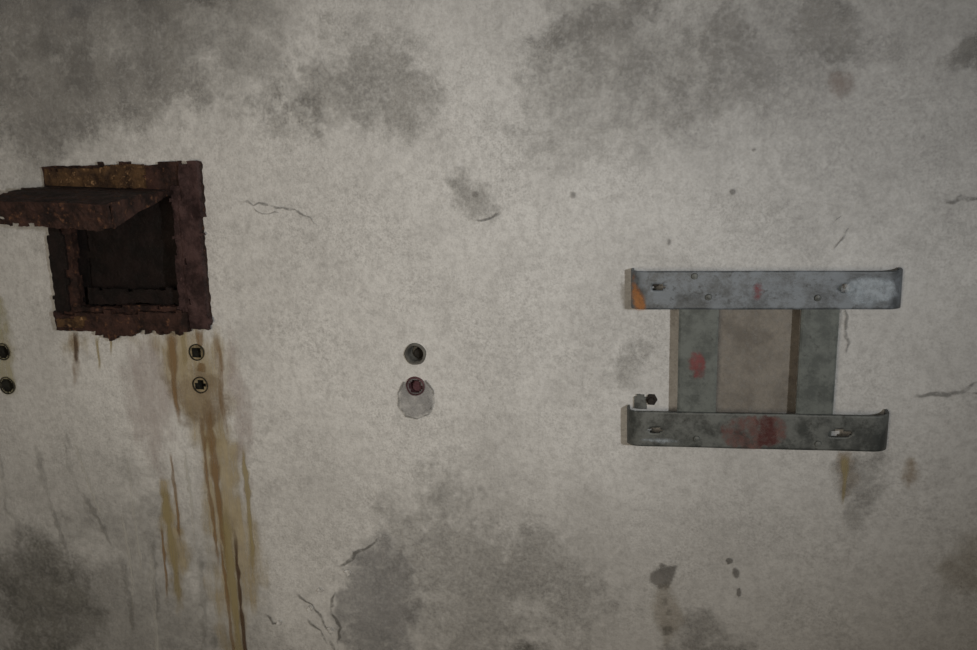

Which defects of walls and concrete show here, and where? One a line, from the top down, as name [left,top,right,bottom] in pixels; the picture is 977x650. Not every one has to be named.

corrosion [155,332,255,650]